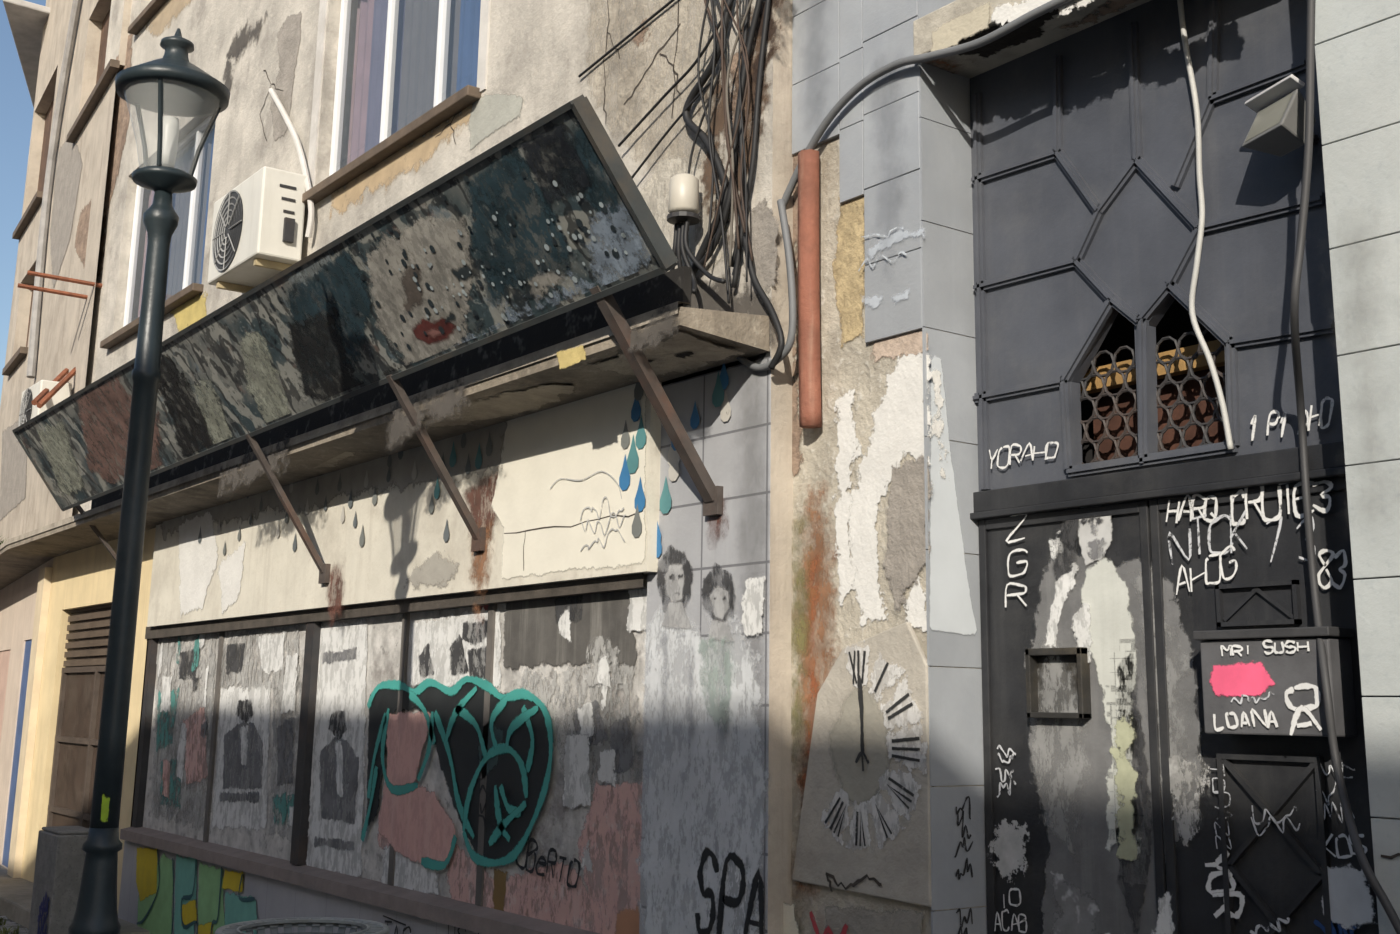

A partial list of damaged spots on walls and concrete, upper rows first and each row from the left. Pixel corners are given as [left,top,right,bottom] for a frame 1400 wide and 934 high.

spalling [270,11,302,140]
peeling [931,0,1136,58]
peeling [832,196,977,635]
corrosion [795,490,837,799]
peeling [783,903,799,934]
flaking render [825,905,923,934]